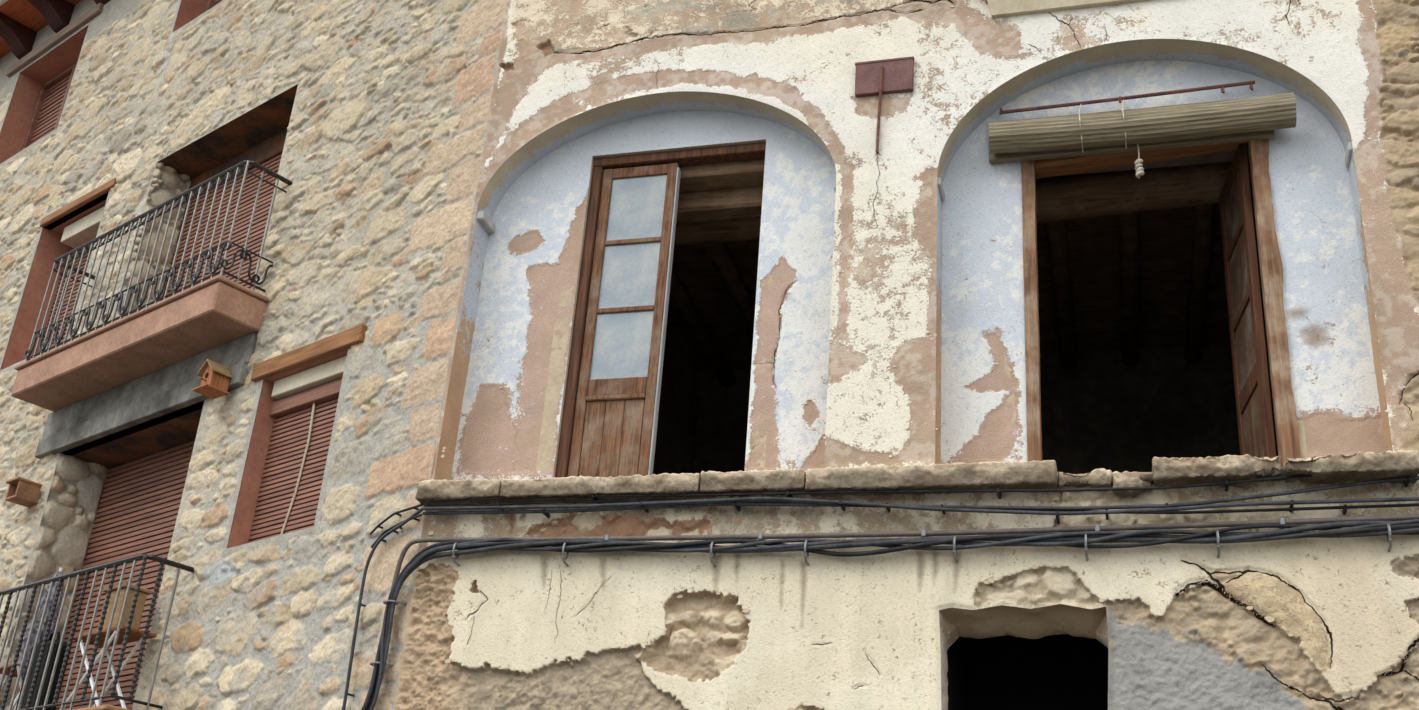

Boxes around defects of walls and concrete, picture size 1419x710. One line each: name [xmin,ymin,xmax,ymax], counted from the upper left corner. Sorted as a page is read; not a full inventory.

crack [554,0,955,89]
peeling [461,0,1021,383]
peeling [430,194,588,480]
peeling [747,257,797,470]
peeling [802,168,938,470]
peeling [955,330,1020,463]
spalling [393,563,750,710]
spalling [973,564,1419,710]
crack [1176,560,1419,710]
spalling [1391,553,1419,579]